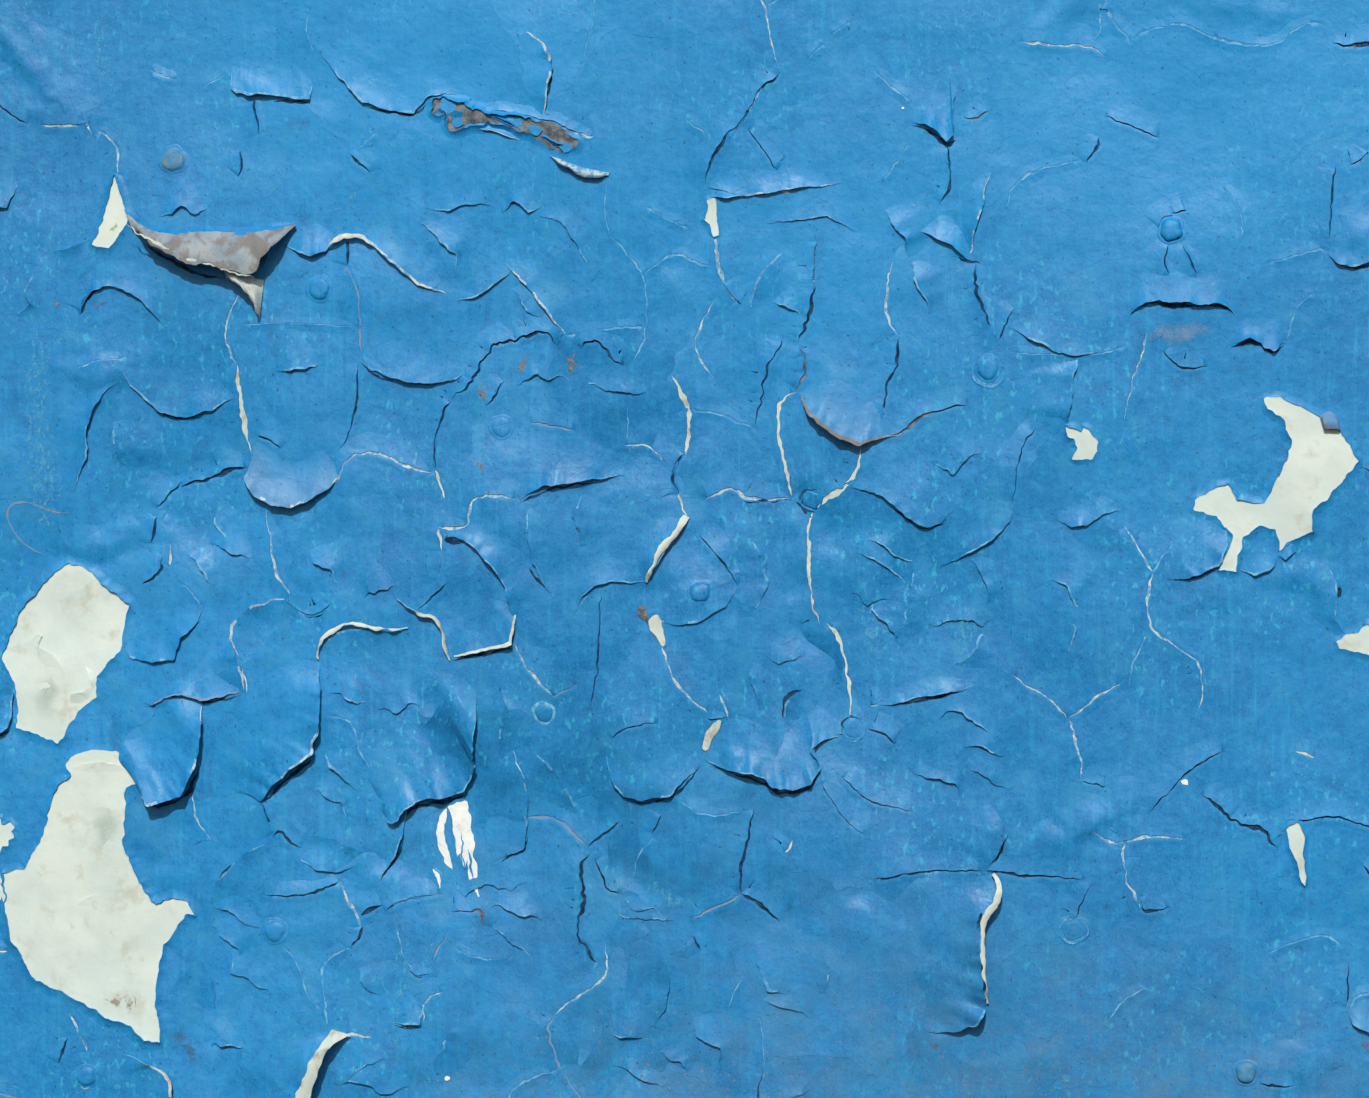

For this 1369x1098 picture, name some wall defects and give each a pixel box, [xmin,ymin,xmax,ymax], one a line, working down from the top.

crack [683,0,852,184]
crack [877,95,989,207]
crack [1001,99,1161,207]
crack [1017,0,1369,64]
peeling [53,164,572,387]
peeling [1010,312,1105,465]
peeling [1163,391,1363,581]
crack [131,172,1369,1031]
peeling [1305,567,1369,662]
peeling [0,418,626,1098]
crack [501,750,790,1098]
peeling [1283,818,1312,889]